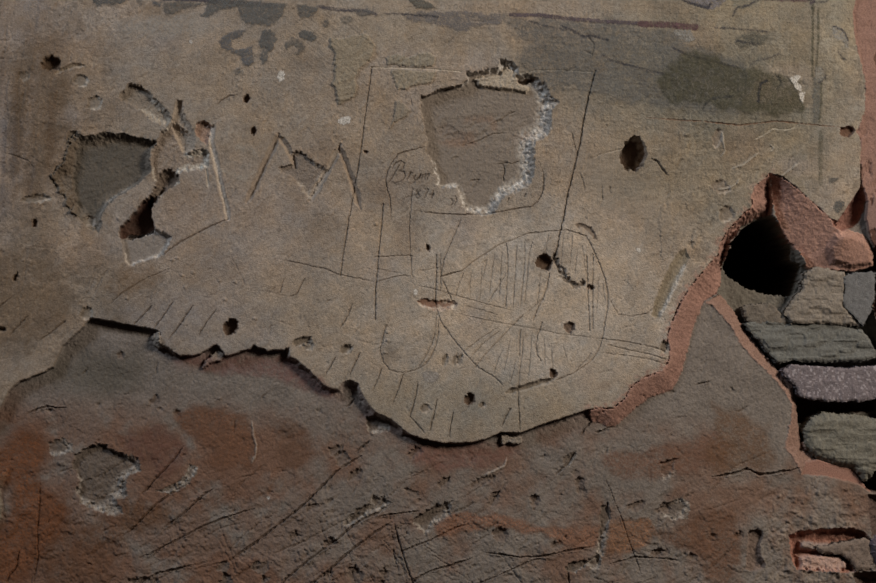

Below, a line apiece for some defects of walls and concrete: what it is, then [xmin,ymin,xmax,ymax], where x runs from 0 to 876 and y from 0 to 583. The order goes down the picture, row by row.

spalling [420,59,560,216]
spalling [853,0,876,200]
spalling [66,130,158,233]
peeling [119,195,172,266]
hole [722,217,801,297]
spalling [286,347,391,435]
spalling [75,443,142,517]
spalling [343,495,393,527]
spalling [413,500,453,536]